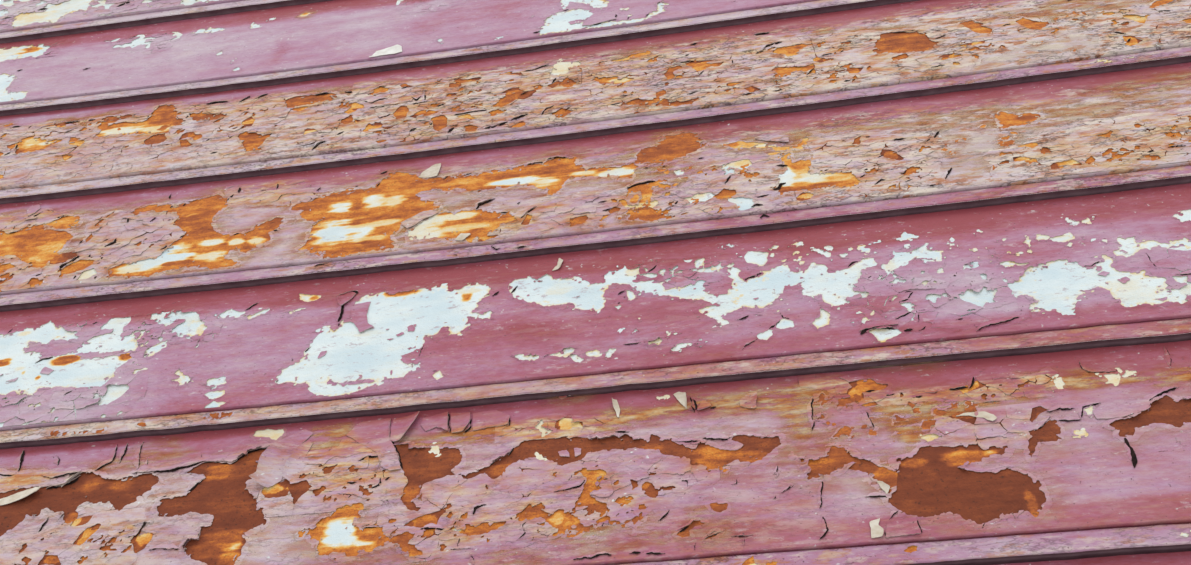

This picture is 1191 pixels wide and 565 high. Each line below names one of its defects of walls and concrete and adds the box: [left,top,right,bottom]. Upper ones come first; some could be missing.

rust [775,0,1177,83]
rust [0,91,353,157]
rust [0,129,877,288]
peeling [455,134,789,242]
peeling [795,132,949,206]
peeling [0,204,1191,427]
peeling [798,366,1067,450]
rust [1044,367,1191,443]
peeling [0,508,160,565]
rust [0,442,275,565]
peeling [249,398,720,563]
rust [288,380,1067,565]